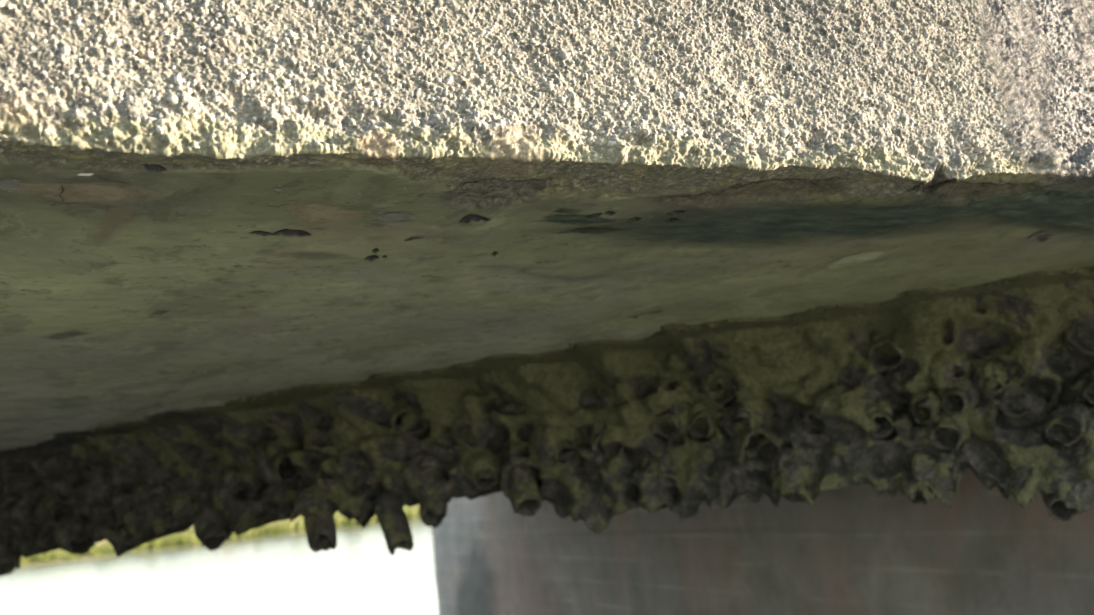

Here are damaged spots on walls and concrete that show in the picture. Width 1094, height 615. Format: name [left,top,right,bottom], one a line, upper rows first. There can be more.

leakage [993,0,1094,184]
spalling [910,164,1045,205]
spalling [250,228,311,237]
spalling [460,214,490,223]